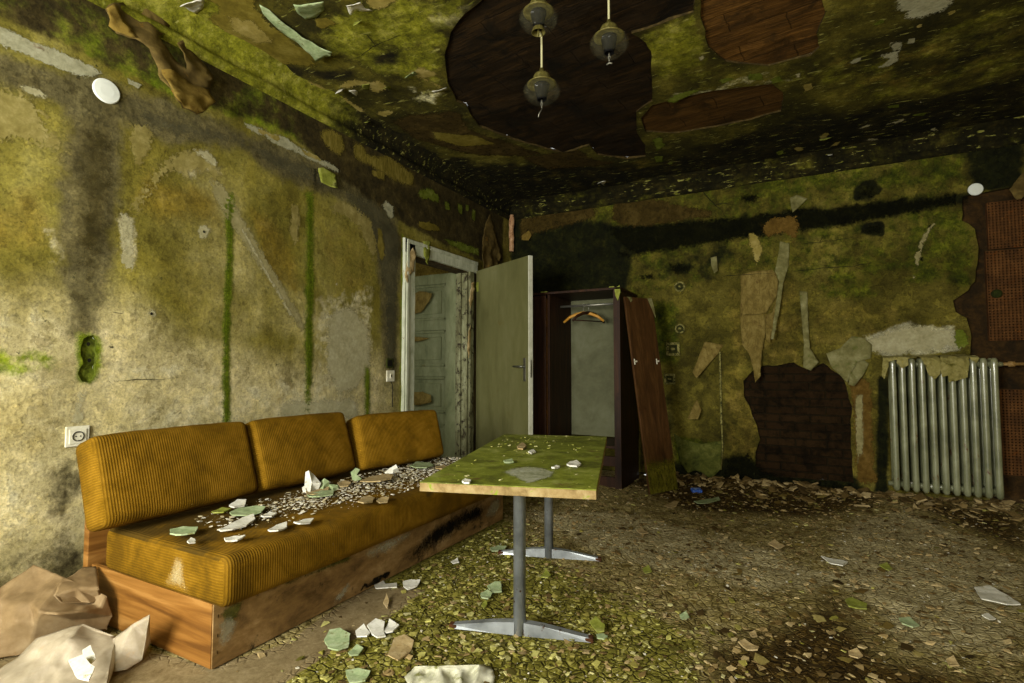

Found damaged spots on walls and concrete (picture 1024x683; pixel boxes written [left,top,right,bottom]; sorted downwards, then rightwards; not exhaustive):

peeling [106,4,137,38]
flaking render [308,0,825,165]
spalling [78,335,98,382]
damp [223,201,232,422]
damp [241,140,400,370]
flaking render [748,216,800,265]
flaking render [953,187,1024,391]
flaking render [743,362,878,485]
flaking render [993,475,1024,504]